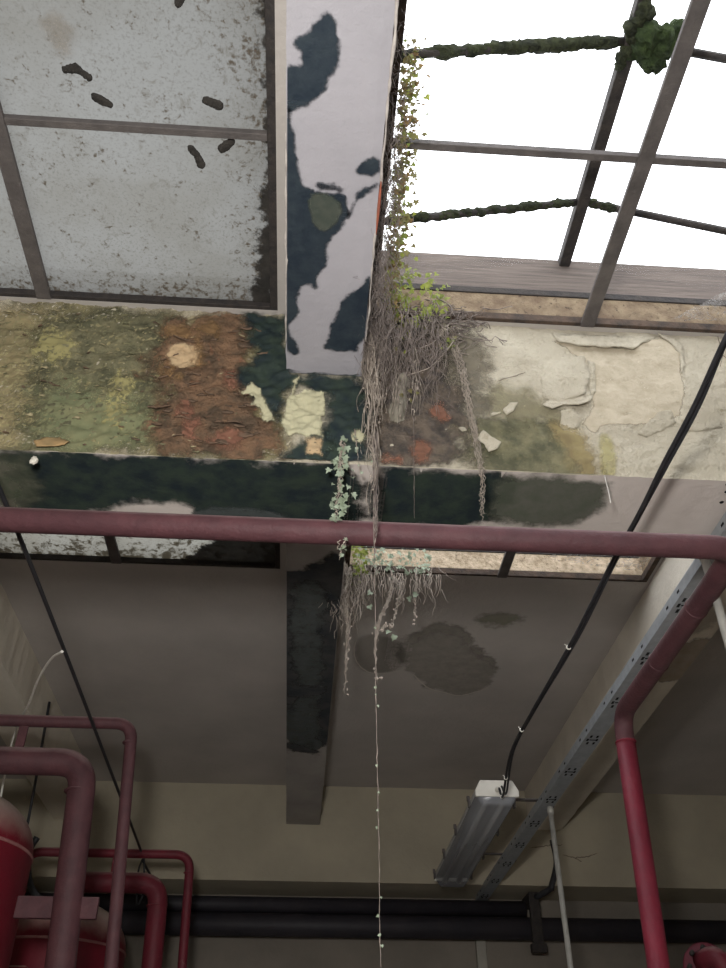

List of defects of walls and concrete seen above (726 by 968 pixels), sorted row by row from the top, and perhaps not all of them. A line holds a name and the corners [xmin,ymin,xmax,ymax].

spalling [364,0,399,342]
leakage [0,13,593,525]
flaking render [118,311,325,460]
peeling [477,430,501,452]
peeling [490,402,518,416]
leakage [353,624,497,696]